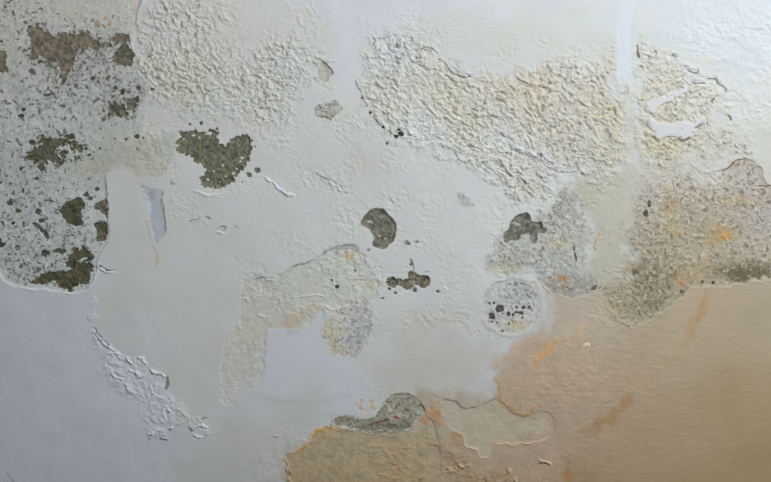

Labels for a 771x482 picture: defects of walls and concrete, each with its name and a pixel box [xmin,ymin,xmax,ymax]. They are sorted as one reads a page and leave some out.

flaking render [0,0,336,441]
peeling [314,99,343,121]
peeling [219,208,440,406]
peeling [284,392,556,482]
peeling [352,23,771,339]
damp [435,277,771,482]